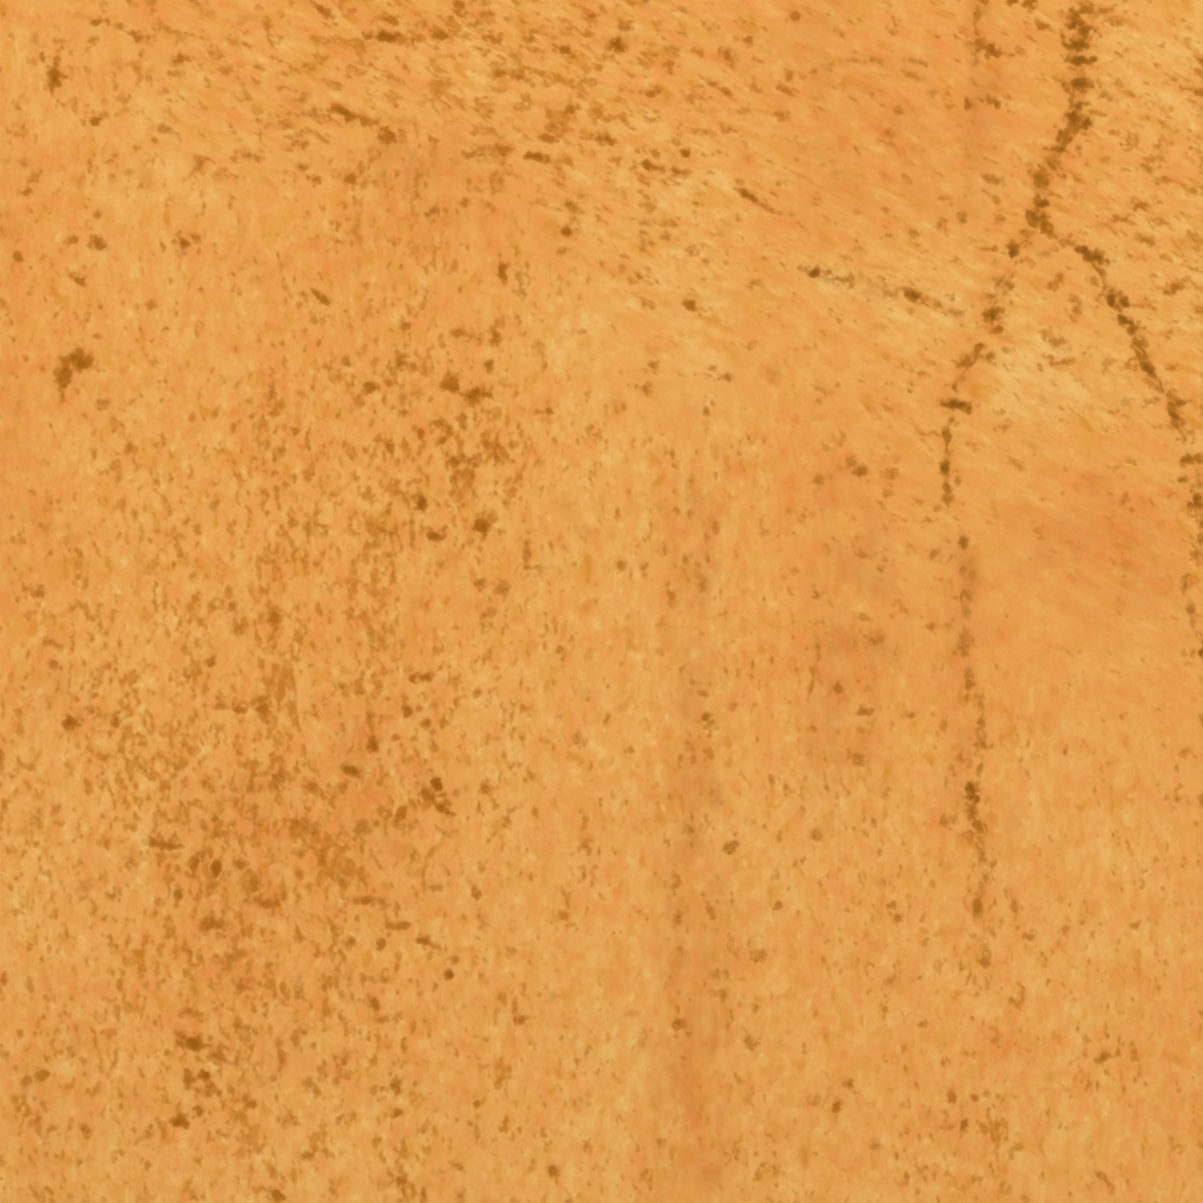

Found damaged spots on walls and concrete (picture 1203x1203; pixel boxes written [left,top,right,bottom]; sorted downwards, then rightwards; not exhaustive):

crack [935,4,1203,613]
crack [966,719,985,854]
crack [974,899,982,912]